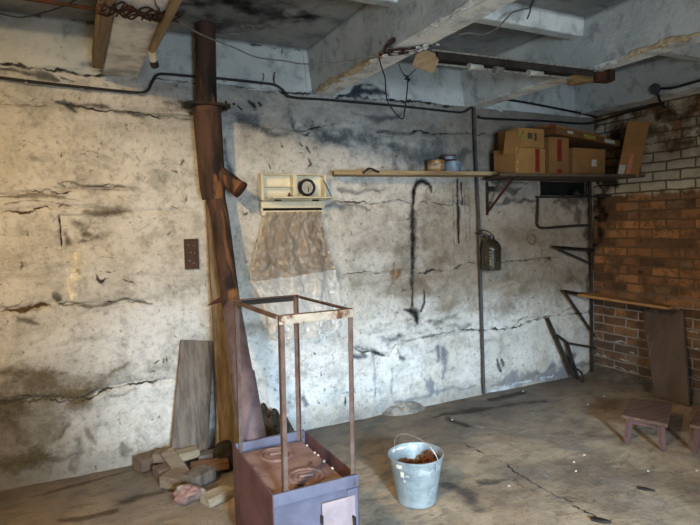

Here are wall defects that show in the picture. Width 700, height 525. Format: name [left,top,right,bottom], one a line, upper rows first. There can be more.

spalling [592,32,700,70]
crack [74,105,171,120]
crack [364,96,486,136]
crack [337,198,445,206]
crack [3,300,63,313]
crack [462,307,586,331]
crack [0,380,157,405]
crack [507,465,596,517]